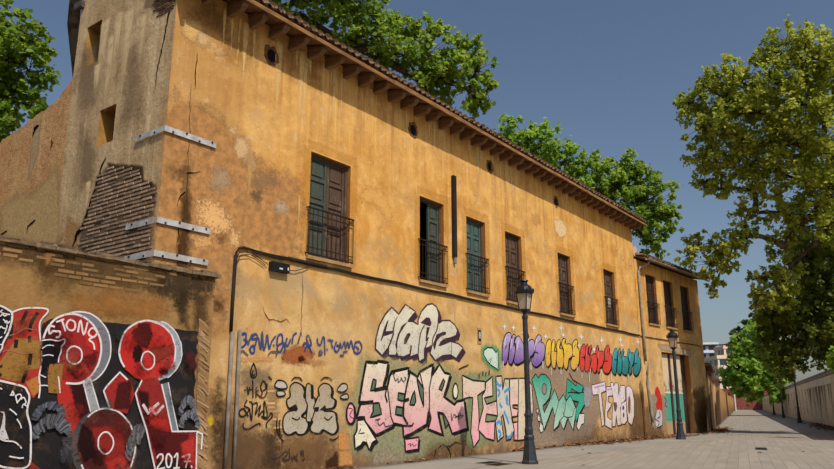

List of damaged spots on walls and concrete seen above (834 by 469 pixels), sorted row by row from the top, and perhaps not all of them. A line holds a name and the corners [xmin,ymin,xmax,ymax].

crack [155,11,170,88]
spalling [152,0,175,18]
peeling [180,18,225,56]
crack [177,54,200,268]
flaking render [0,85,305,331]
spalling [282,346,322,366]